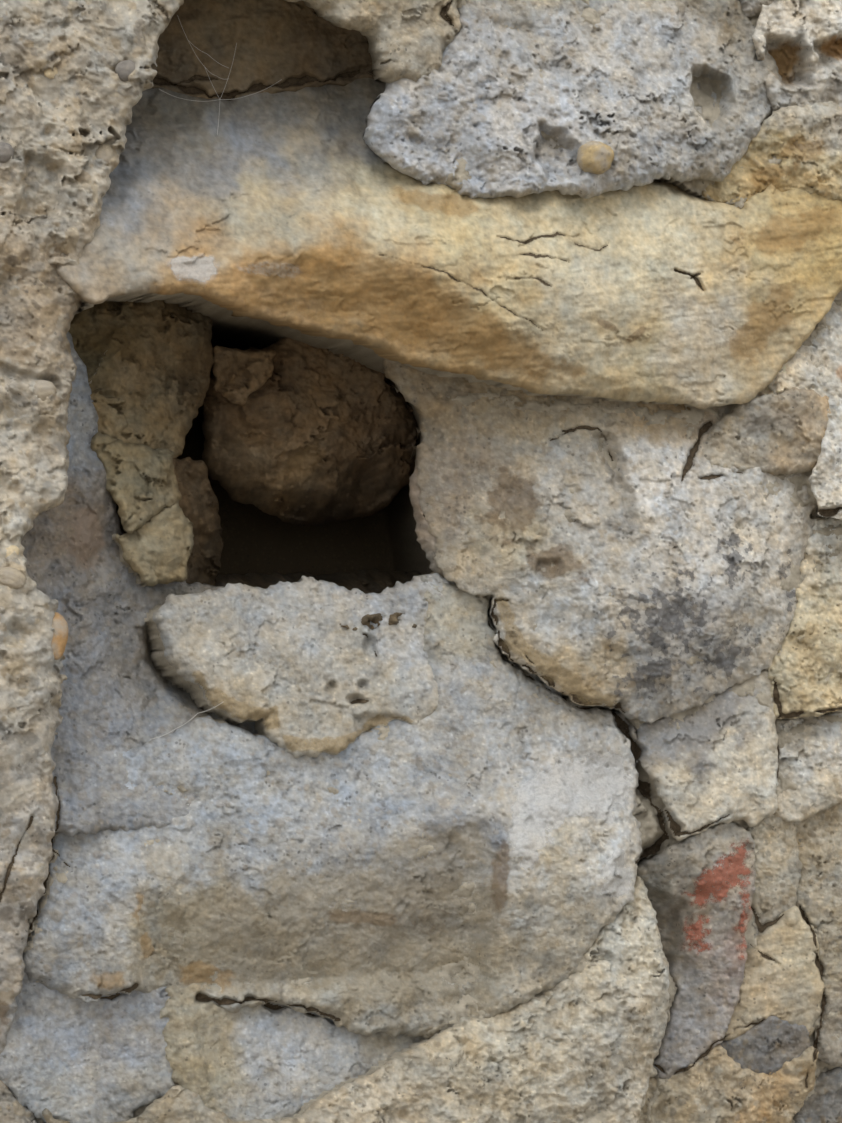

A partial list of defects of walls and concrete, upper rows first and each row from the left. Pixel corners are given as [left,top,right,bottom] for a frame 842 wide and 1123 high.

crack [440,0,454,26]
crack [681,421,742,481]
crack [0,776,70,943]
crack [81,983,138,1000]
crack [196,993,340,1021]